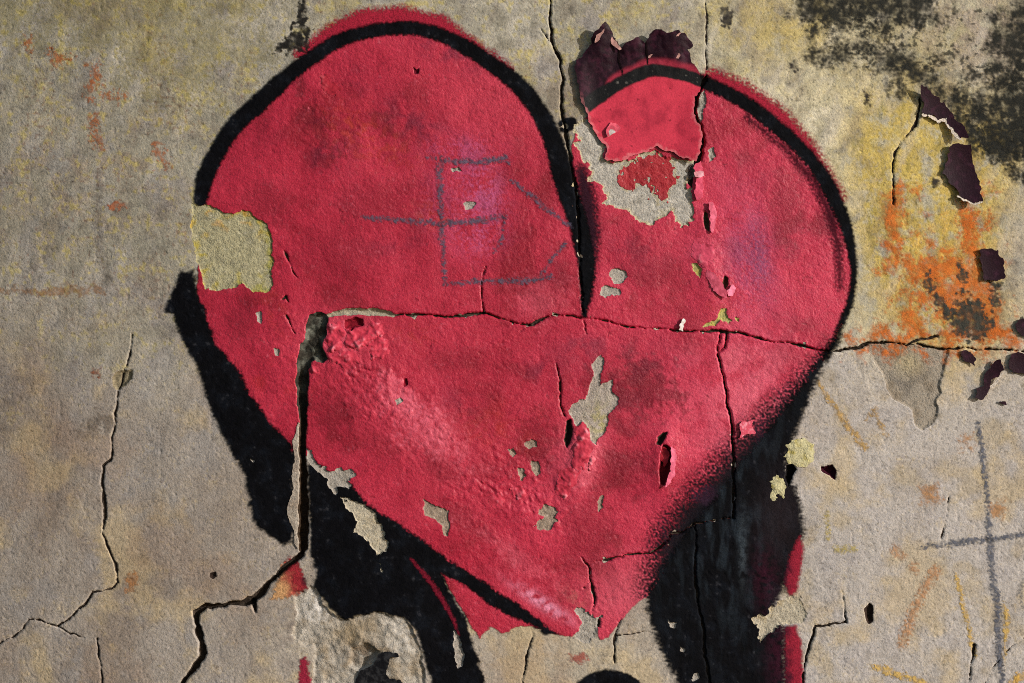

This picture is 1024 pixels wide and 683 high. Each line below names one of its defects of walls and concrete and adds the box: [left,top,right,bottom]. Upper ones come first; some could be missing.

peeling [573,22,716,228]
water stain [784,0,1024,183]
peeling [920,85,983,205]
peeling [190,204,274,293]
crack [181,0,635,683]
corrosion [844,184,1019,358]
peeling [979,248,1006,281]
crack [0,332,134,683]
peeling [306,448,389,573]
peeling [535,355,619,530]
hole [785,464,797,487]
crack [582,328,1024,683]